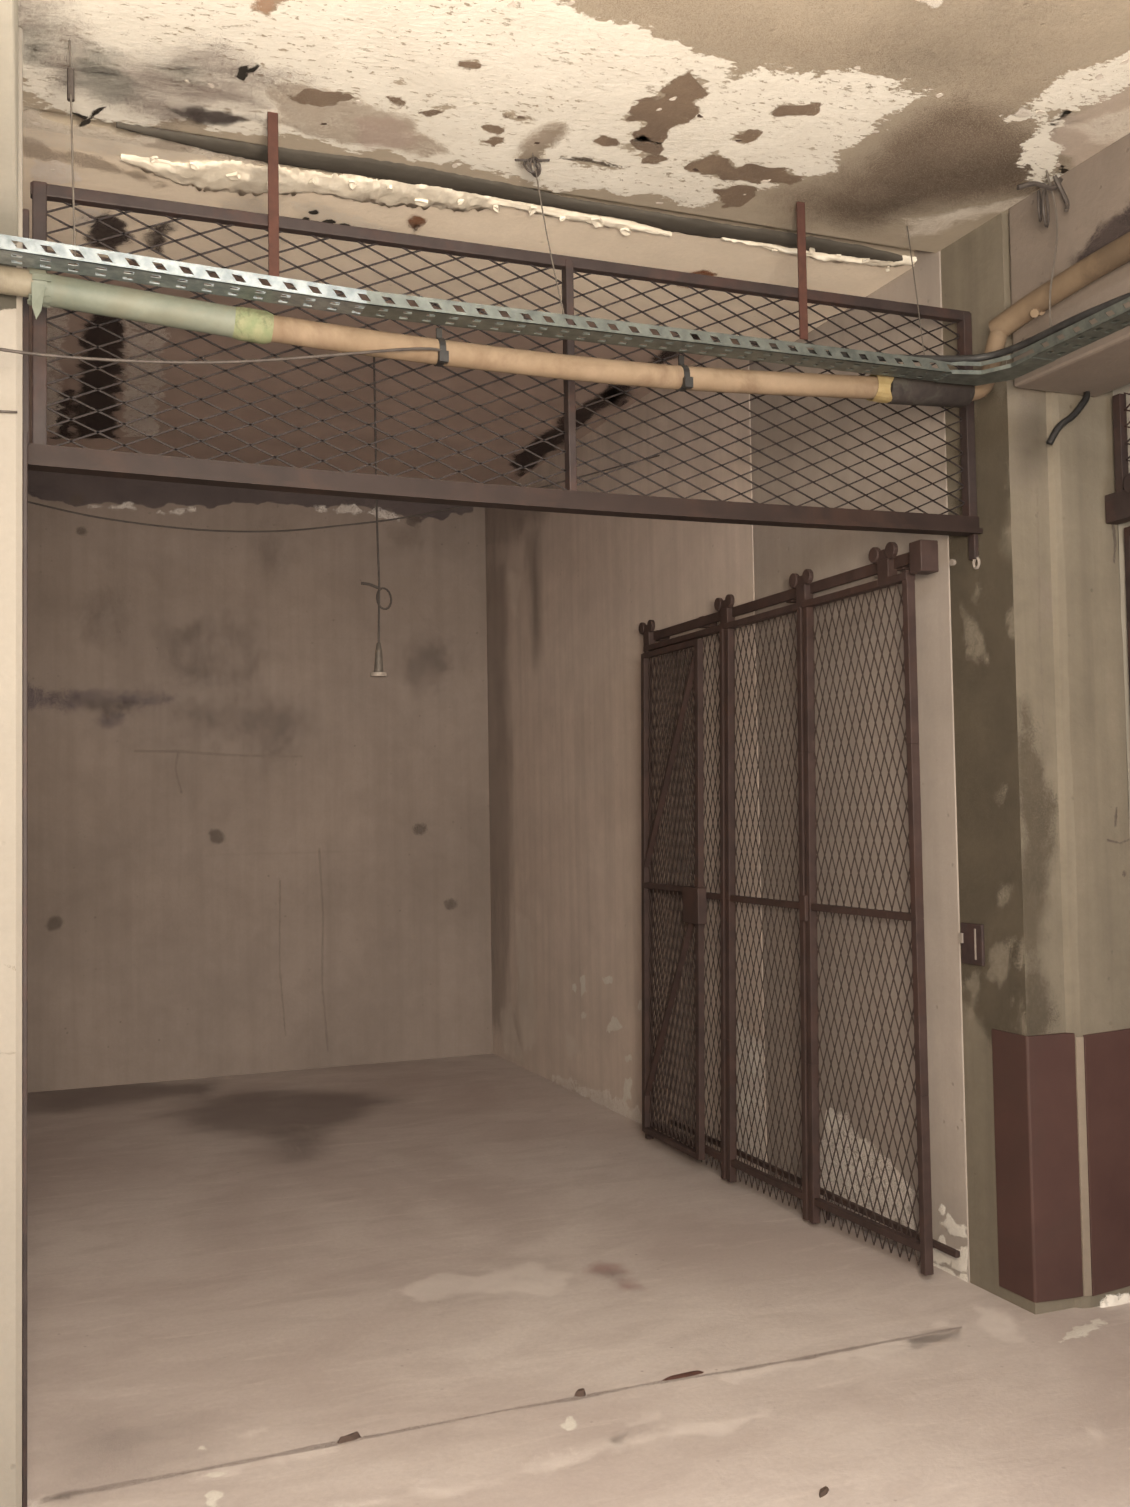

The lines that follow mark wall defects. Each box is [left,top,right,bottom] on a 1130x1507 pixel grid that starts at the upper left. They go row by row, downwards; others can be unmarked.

damp [18,0,329,132]
peeling [18,0,944,208]
damp [484,0,1130,240]
peeling [1048,87,1130,170]
peeling [71,205,106,228]
peeling [214,195,397,232]
damp [28,682,182,733]
damp [949,360,1061,1048]